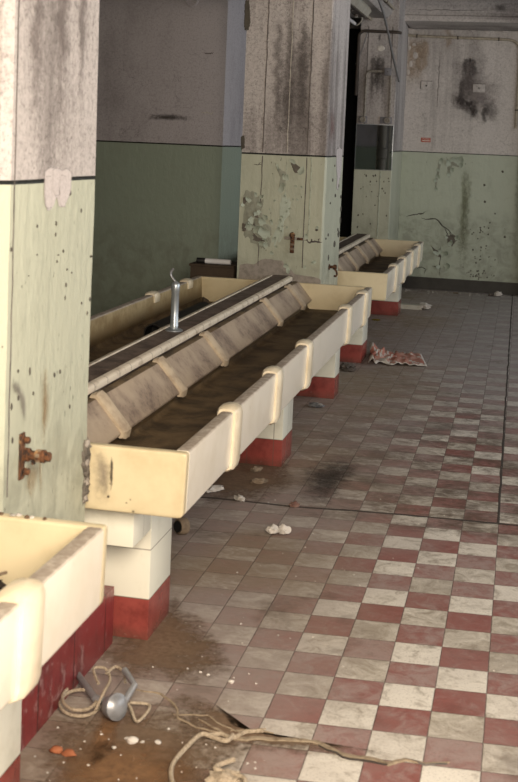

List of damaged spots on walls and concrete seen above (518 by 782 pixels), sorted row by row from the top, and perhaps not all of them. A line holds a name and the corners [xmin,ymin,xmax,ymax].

peeling [275,159,304,193]
peeling [238,190,321,284]
crack [406,211,452,274]